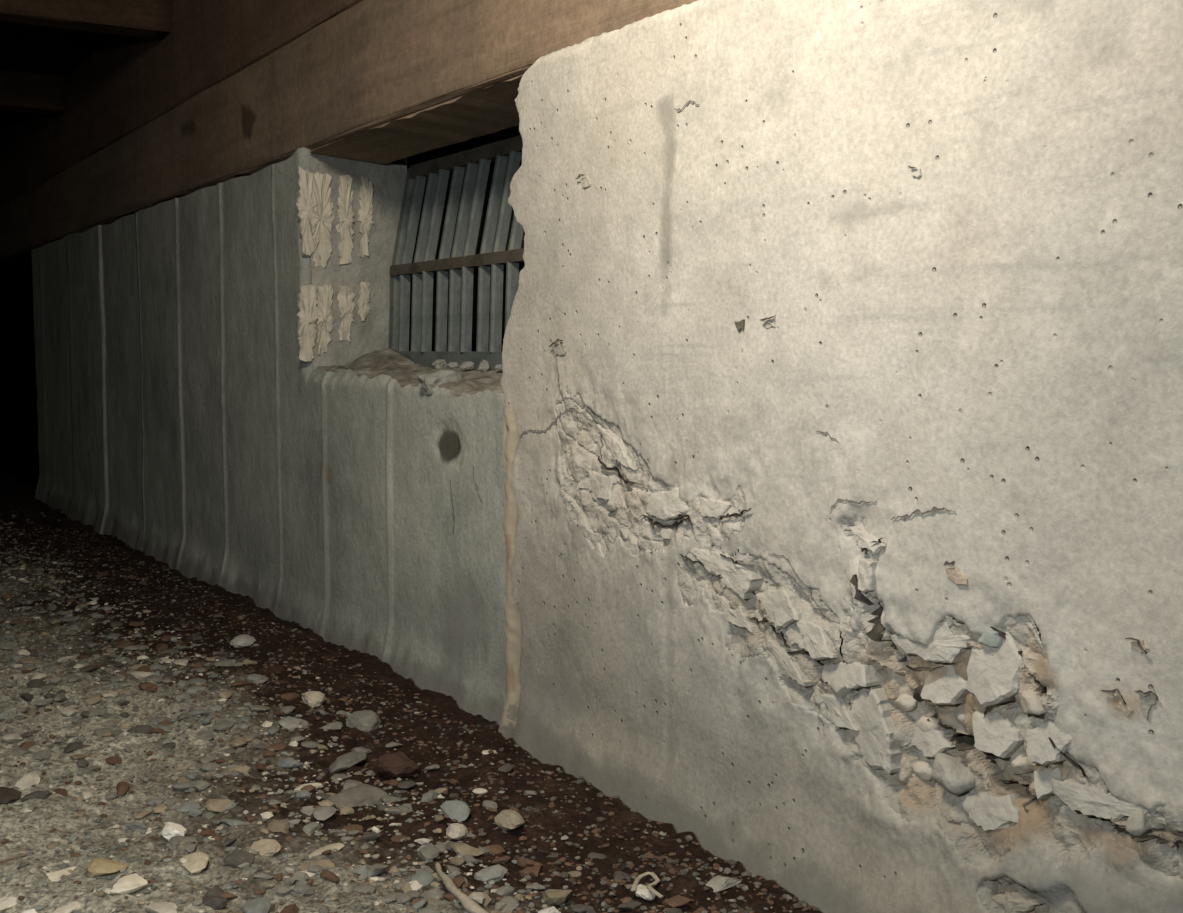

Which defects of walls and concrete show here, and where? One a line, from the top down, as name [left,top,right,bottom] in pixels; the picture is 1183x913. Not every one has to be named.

crack [519,352,603,457]
crack [831,498,877,507]
crack [768,553,825,617]
spalling [555,388,1183,913]